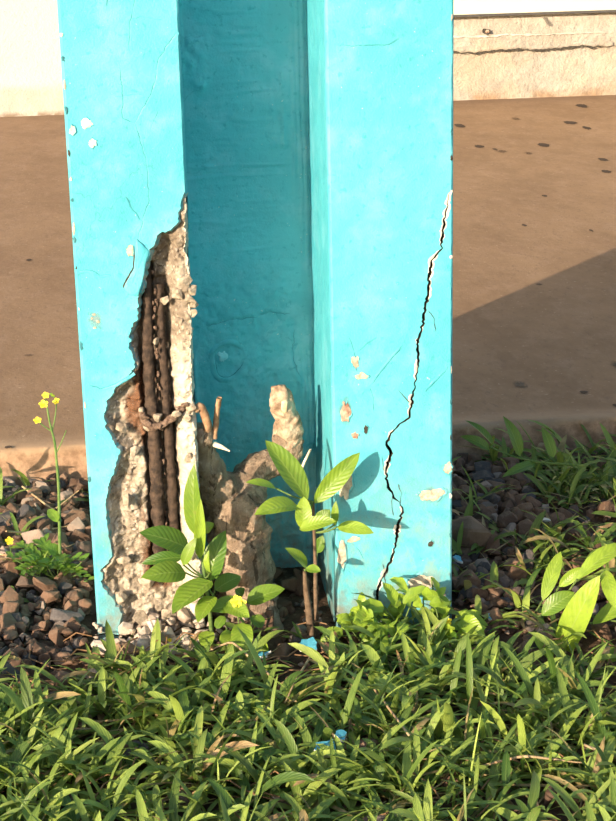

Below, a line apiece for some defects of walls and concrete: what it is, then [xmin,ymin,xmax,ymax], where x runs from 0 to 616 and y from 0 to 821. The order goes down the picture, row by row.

crack [120,0,179,240]
peeling [350,355,371,380]
corrosion [126,362,146,443]
spalling [100,192,205,641]
peeling [340,400,353,422]
crack [370,190,453,600]
peeling [339,473,355,500]
peeling [416,486,452,501]
corrosion [144,540,154,572]
peeling [337,536,360,572]